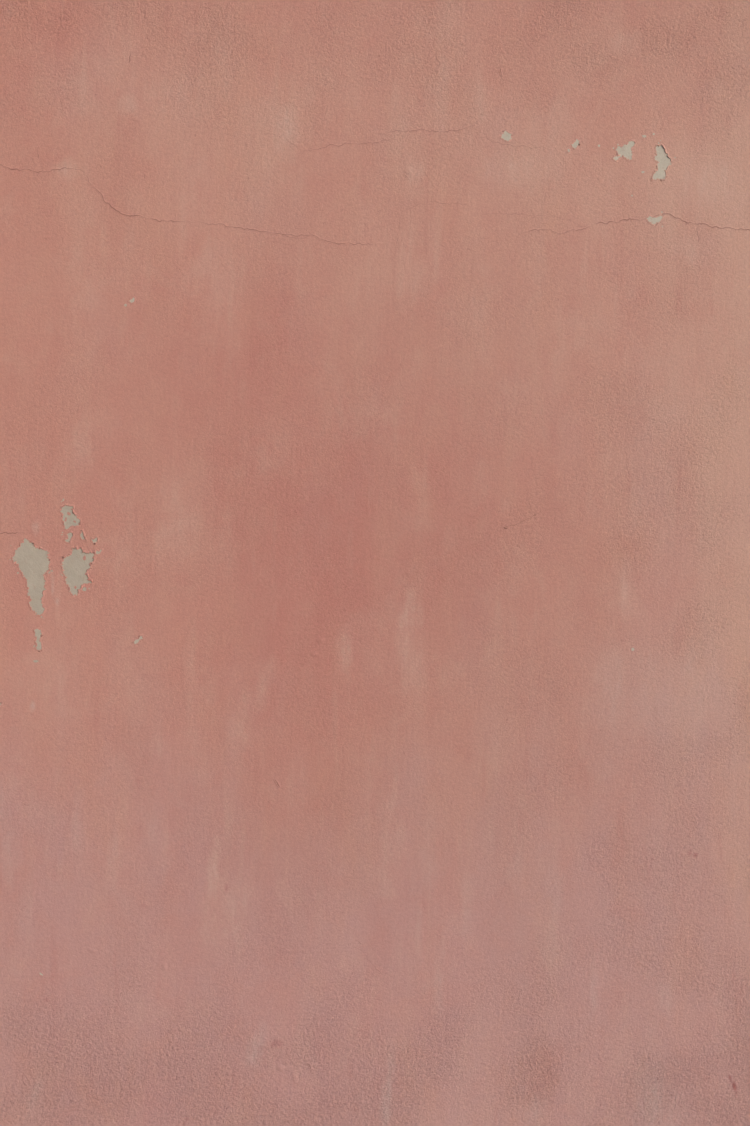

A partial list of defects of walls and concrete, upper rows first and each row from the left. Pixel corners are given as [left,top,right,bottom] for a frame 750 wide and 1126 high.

peeling [598,133,676,182]
crack [518,212,750,237]
peeling [9,498,104,662]